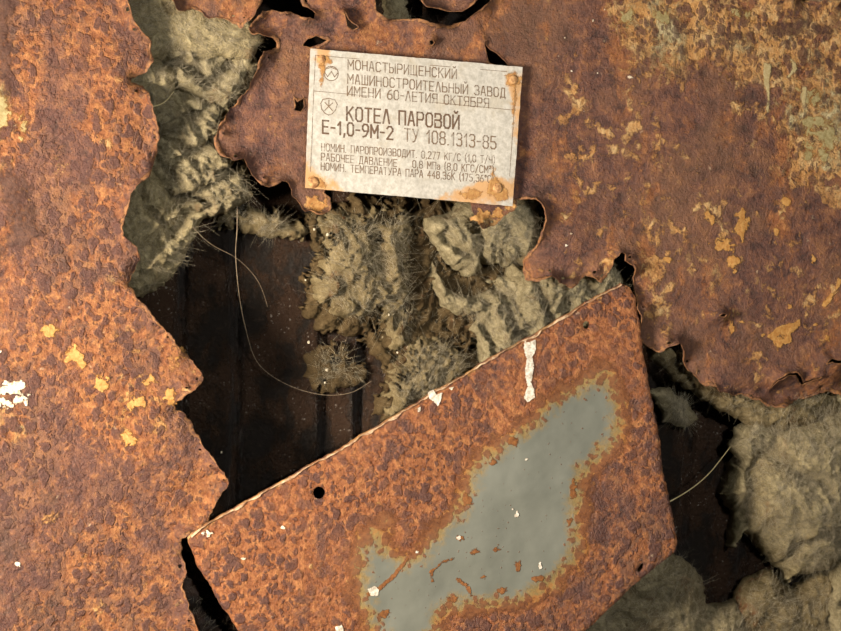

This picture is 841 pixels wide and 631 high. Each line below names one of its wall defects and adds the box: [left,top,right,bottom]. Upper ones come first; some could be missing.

peeling [374,0,492,29]
rust [766,18,832,38]
rust [318,55,333,86]
peeling [173,0,332,215]
rust [306,176,328,213]
rust [459,169,516,224]
rust [708,207,751,274]
peeling [40,319,59,338]
peeling [119,0,229,631]
rust [761,319,801,351]
peeling [64,344,87,369]
peeling [93,374,110,392]